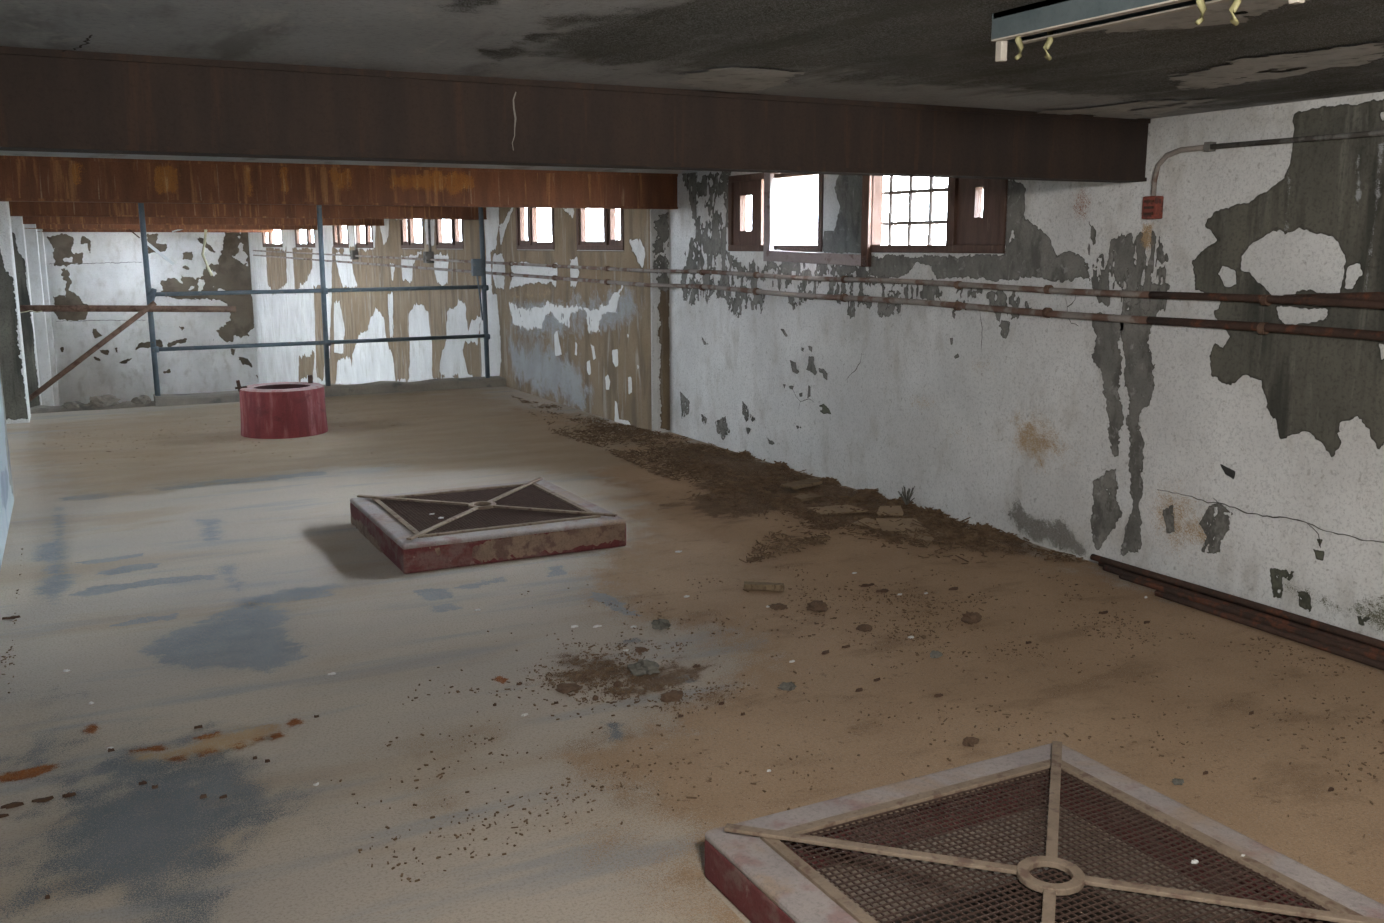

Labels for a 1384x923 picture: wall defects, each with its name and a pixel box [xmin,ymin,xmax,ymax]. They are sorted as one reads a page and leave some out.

peeling [0,232,40,494]
peeling [47,233,187,364]
peeling [155,171,1170,556]
peeling [1192,99,1384,457]
damp [23,491,344,673]
damp [155,471,326,491]
peeling [472,524,625,563]
peeling [1162,505,1175,533]
peeling [1199,503,1233,554]
crack [1157,489,1384,548]